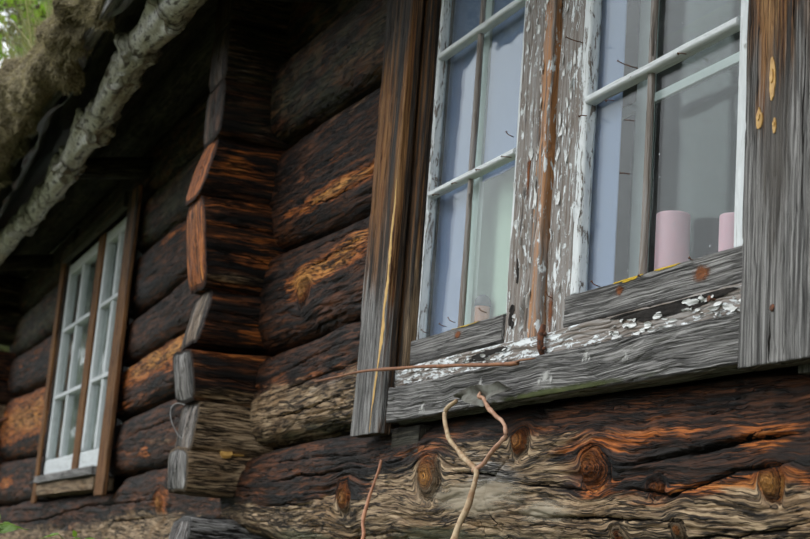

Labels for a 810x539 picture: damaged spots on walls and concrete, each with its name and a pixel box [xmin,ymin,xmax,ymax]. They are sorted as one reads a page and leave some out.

peeling [558,51,576,137]
peeling [513,146,539,245]
peeling [609,295,741,340]
crack [612,430,805,466]
crack [447,473,496,484]
crack [514,481,593,492]
crack [611,460,794,498]
crack [478,511,680,539]
crack [694,522,810,539]